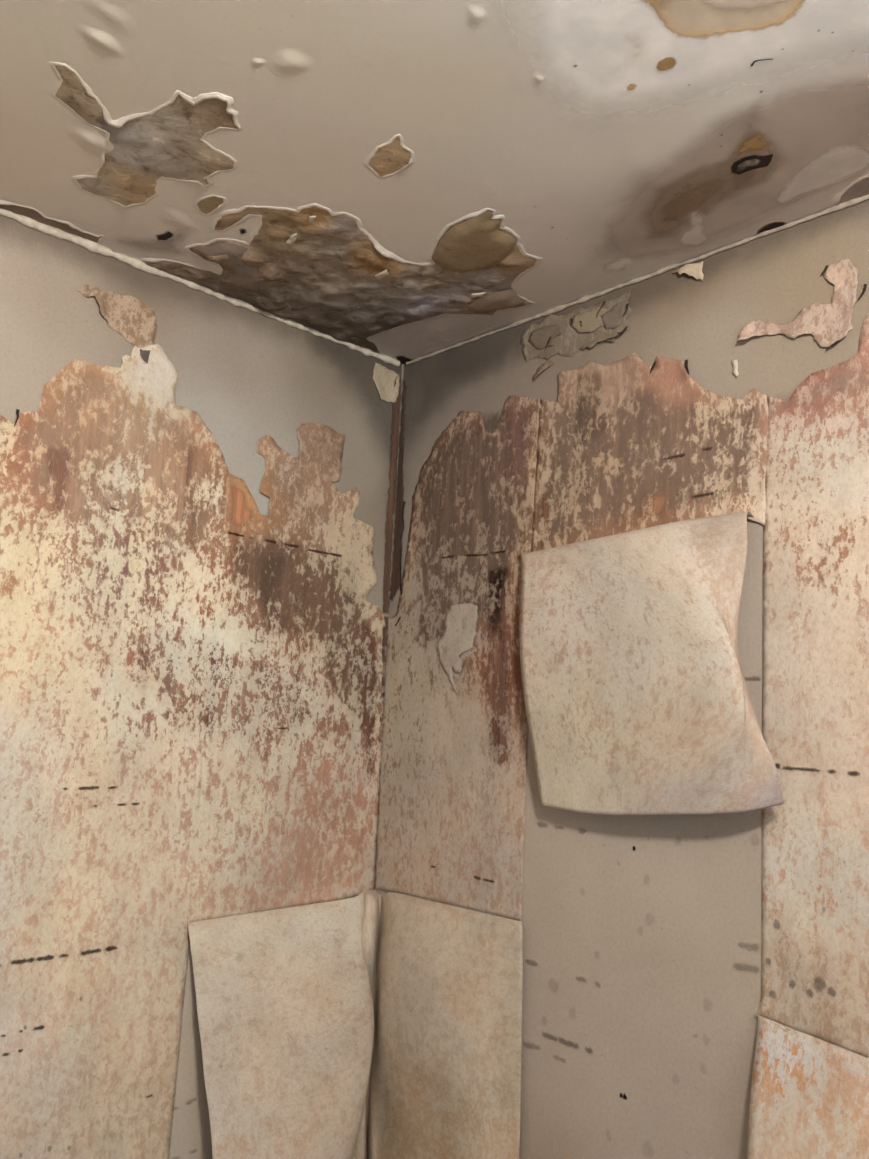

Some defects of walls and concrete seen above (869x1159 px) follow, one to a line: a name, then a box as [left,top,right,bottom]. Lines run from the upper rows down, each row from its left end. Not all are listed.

water stain [528,0,869,107]
spalling [50,61,542,403]
water stain [323,207,848,465]
flaking render [671,261,704,281]
water stain [606,85,869,271]
water stain [228,532,342,557]